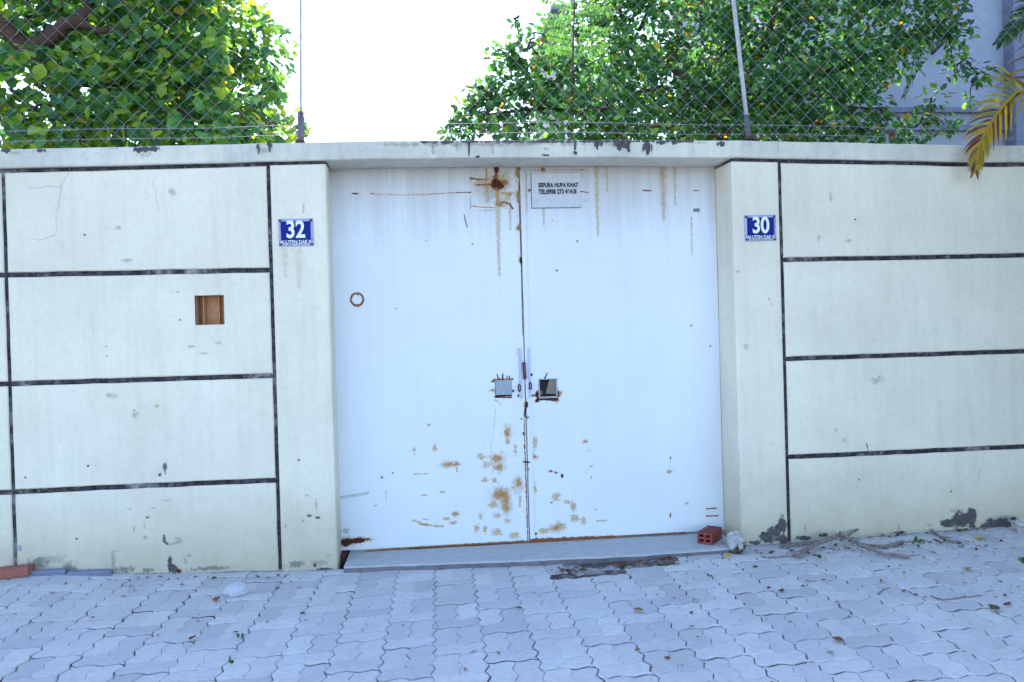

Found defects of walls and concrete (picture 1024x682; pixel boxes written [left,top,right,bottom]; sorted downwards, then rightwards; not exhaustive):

rust [352,167,531,298]
rust [341,374,686,552]
spalling [749,518,788,545]
spalling [940,508,1016,528]